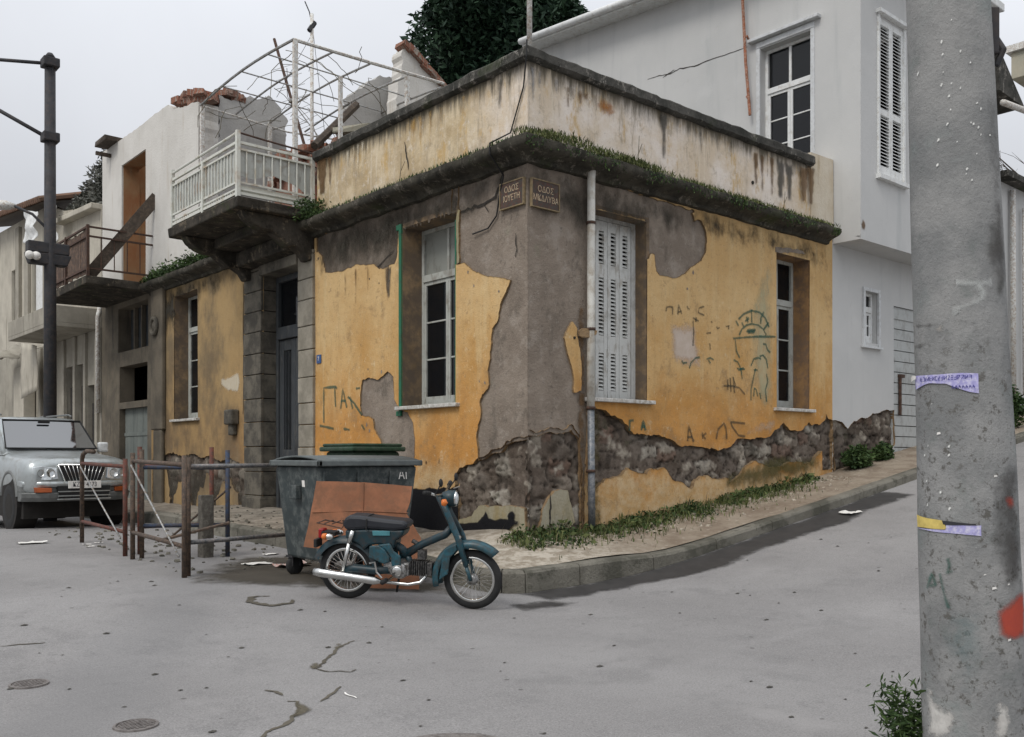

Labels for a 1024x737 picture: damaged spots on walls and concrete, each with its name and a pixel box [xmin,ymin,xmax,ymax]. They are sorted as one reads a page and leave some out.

crack [649,48,743,79]
leakage [777,161,793,199]
peeling [316,163,895,533]